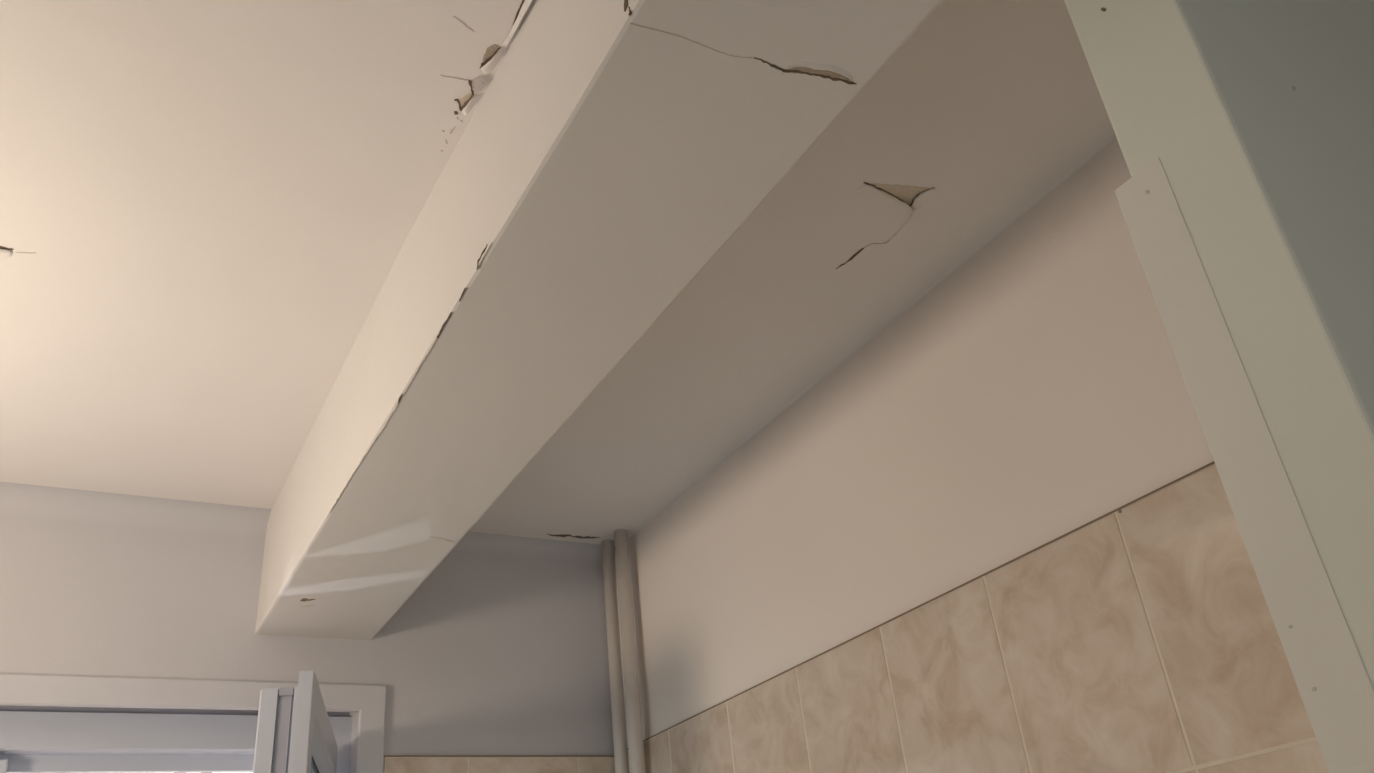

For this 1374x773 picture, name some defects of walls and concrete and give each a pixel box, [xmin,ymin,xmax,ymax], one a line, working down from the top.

crack [624,0,856,84]
crack [0,246,32,261]
crack [836,244,871,269]